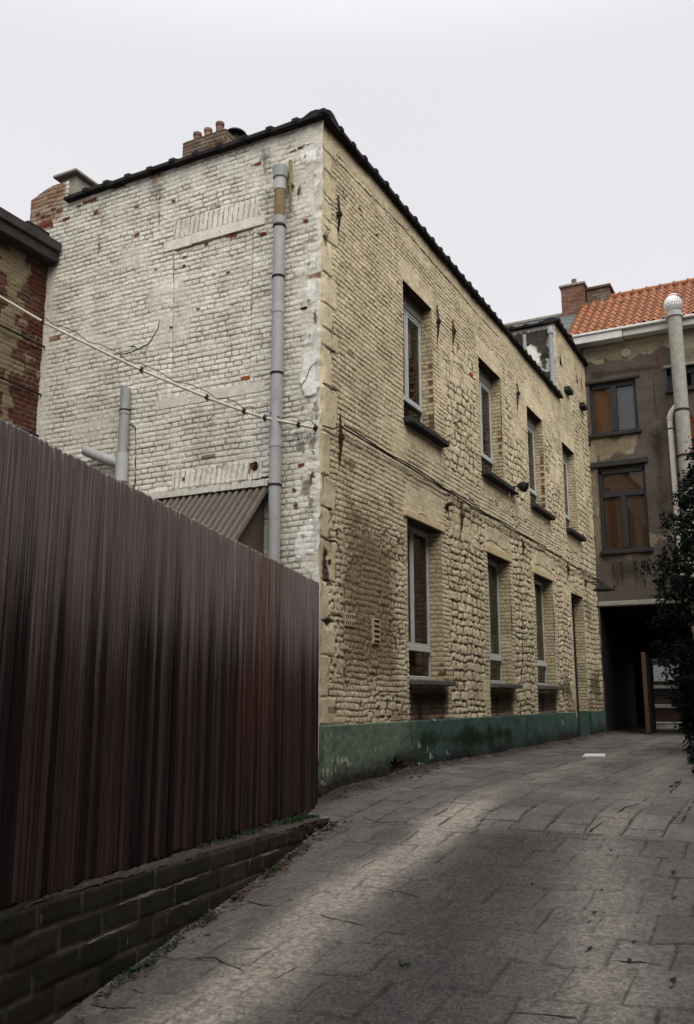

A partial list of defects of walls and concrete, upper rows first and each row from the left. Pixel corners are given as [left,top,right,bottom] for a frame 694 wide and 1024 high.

peeling [3,252,46,337]
spalling [320,731,351,786]
spalling [390,742,433,773]
leakage [421,725,512,748]